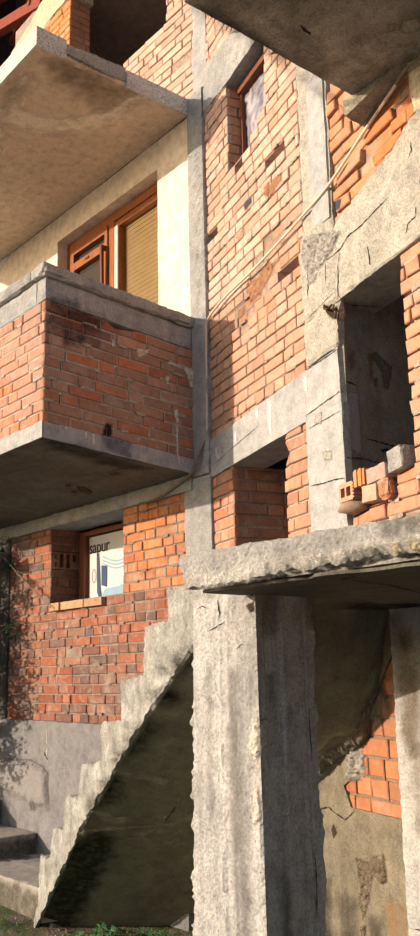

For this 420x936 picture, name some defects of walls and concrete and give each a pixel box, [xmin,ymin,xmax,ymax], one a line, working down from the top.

crack [307,198,387,316]
spalling [323,304,345,320]
peeling [199,535,420,584]
leakage [152,689,177,706]
leakage [93,778,120,806]
leakage [0,838,36,861]
leakage [43,823,176,927]
leakage [0,882,38,919]